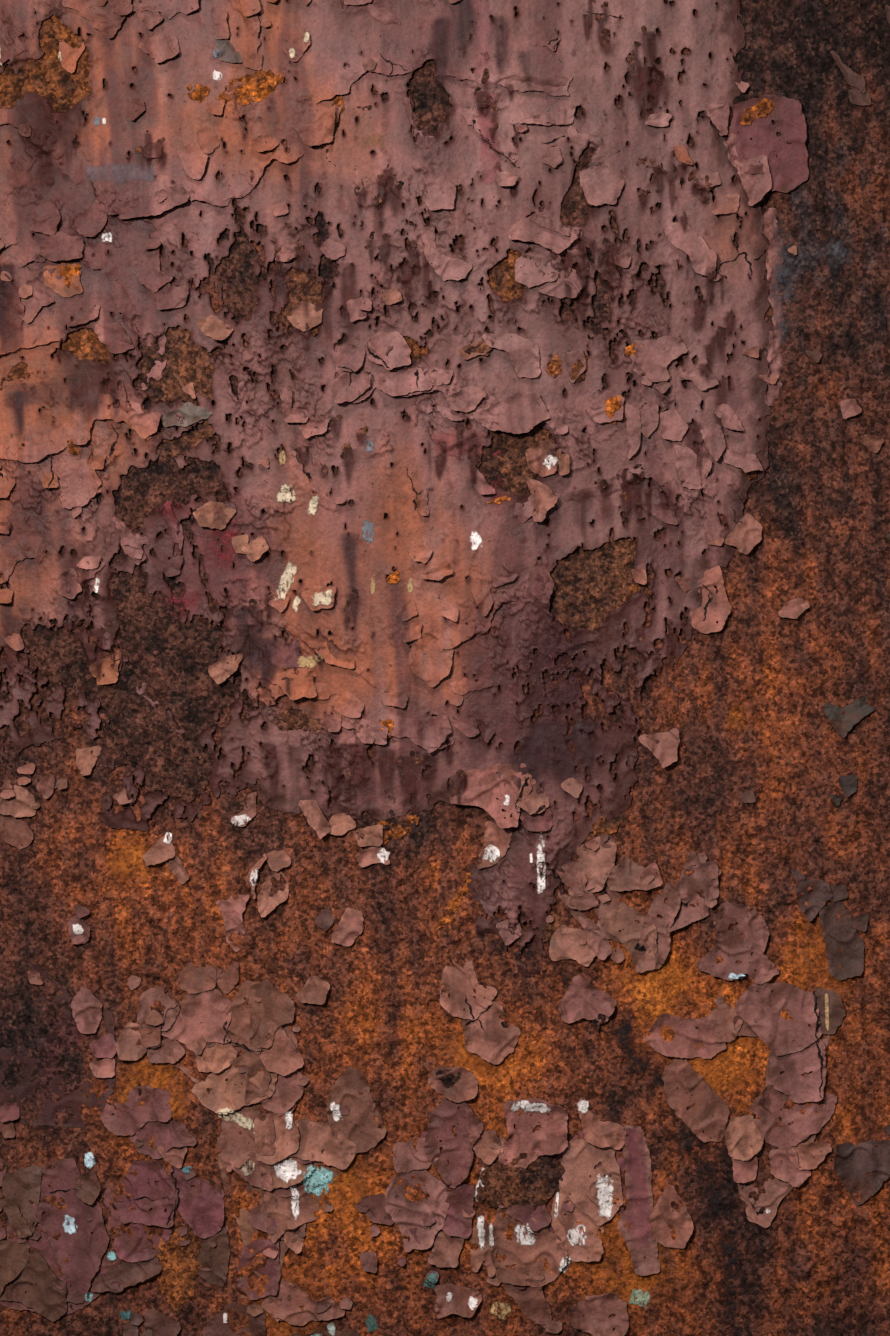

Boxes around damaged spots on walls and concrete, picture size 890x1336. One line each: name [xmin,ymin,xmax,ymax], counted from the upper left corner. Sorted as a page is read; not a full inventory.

rust [0,15,91,114]
rust [482,248,532,302]
rust [560,146,596,315]
rust [112,327,231,530]
peeling [0,0,810,976]
rust [436,426,557,504]
rust [549,536,653,631]
rust [7,563,325,802]
peeling [792,868,869,980]
peeling [0,850,694,1336]
peeling [644,902,890,1228]
rust [476,1152,564,1210]